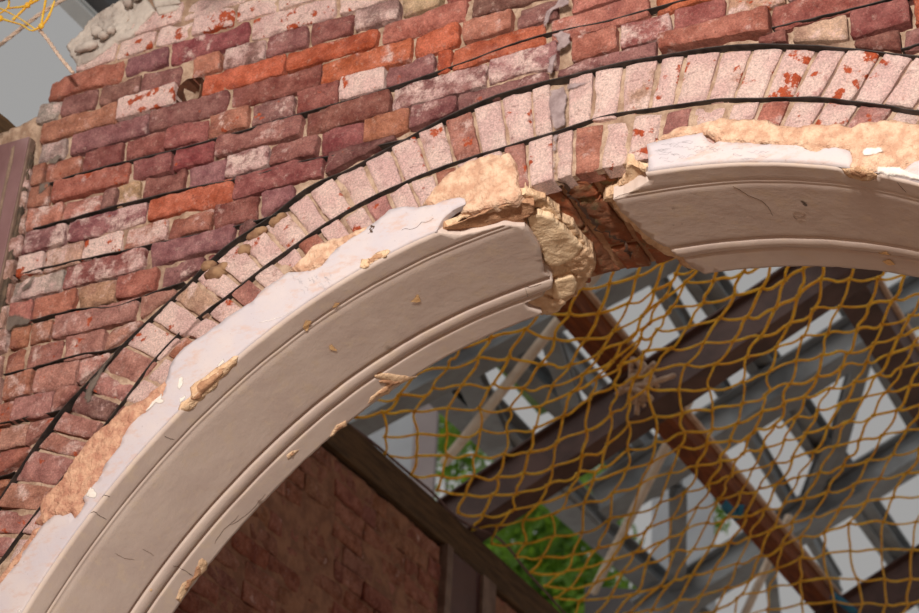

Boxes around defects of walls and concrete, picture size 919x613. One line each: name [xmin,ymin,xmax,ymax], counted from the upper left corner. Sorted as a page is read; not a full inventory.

spalling [176,77,204,103]
flaking render [655,118,919,181]
flaking render [422,153,525,217]
flaking render [289,227,367,272]
flaking render [360,249,390,269]
flaking render [178,356,238,411]
flaking render [0,381,166,583]
flaking render [176,558,208,603]